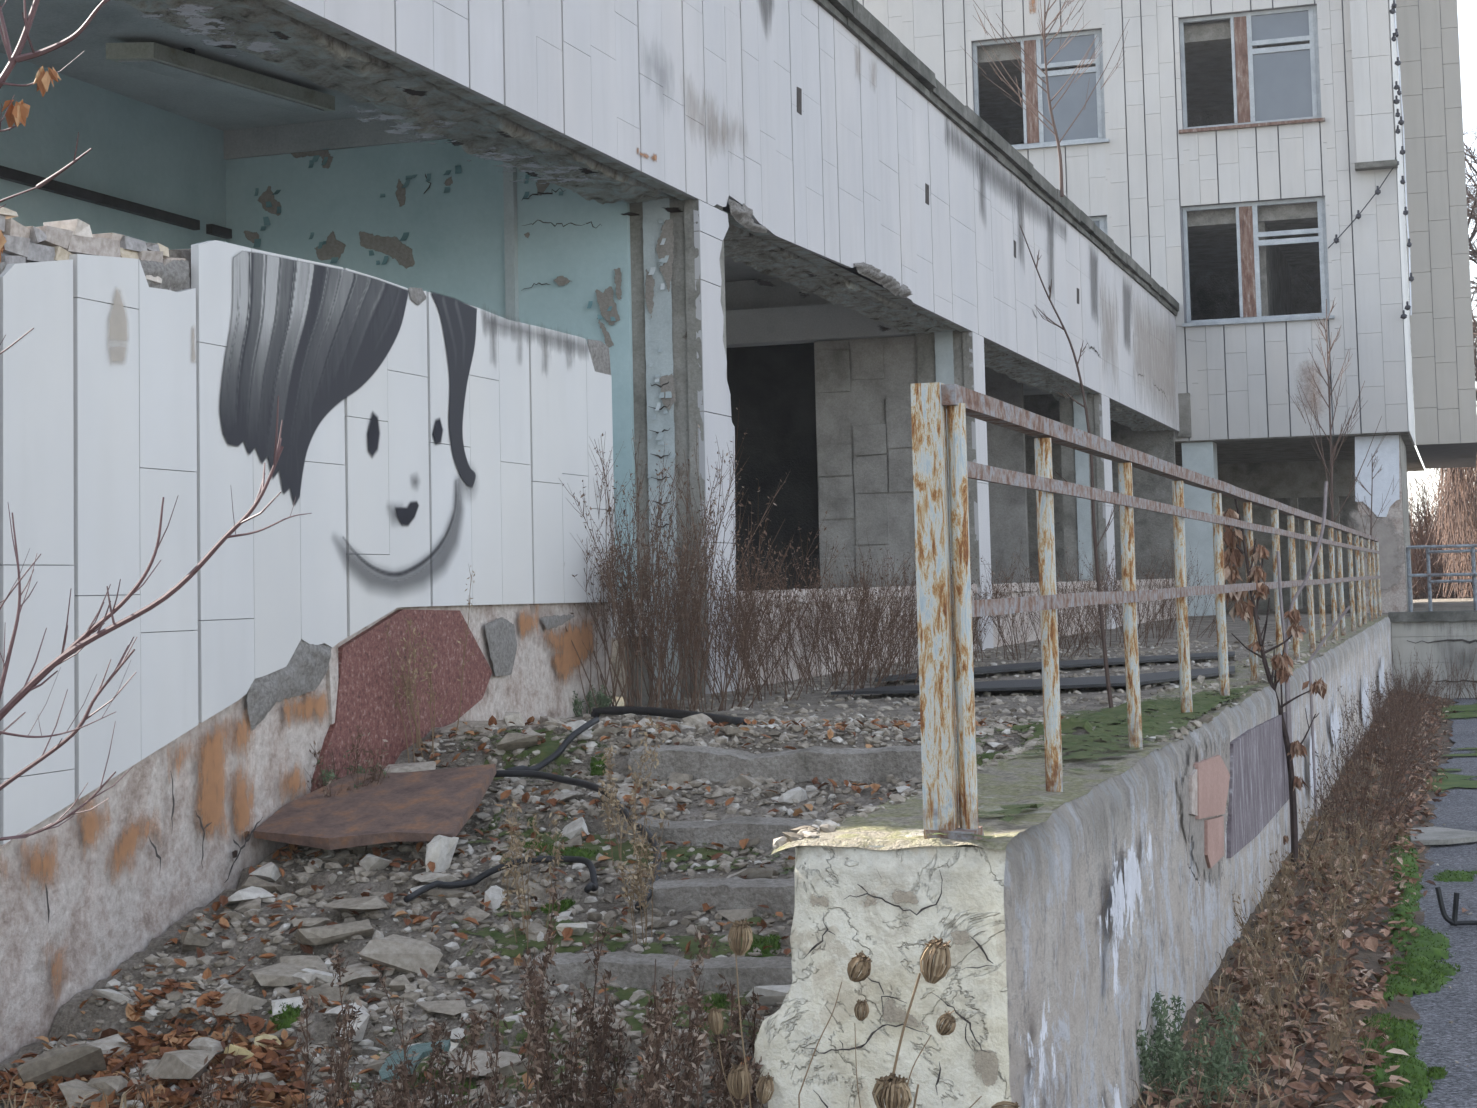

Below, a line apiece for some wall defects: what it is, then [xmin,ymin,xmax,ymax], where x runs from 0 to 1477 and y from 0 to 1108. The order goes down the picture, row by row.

damp [761,0,772,21]
flaking render [0,206,191,292]
peeling [244,186,281,248]
peeling [309,231,415,269]
peeling [586,268,622,375]
spalling [853,262,913,298]
damp [976,157,1053,281]
crack [804,869,943,958]
crack [962,936,993,970]
peeling [1097,833,1153,997]
crack [804,977,990,1095]
peeling [1020,998,1056,1107]